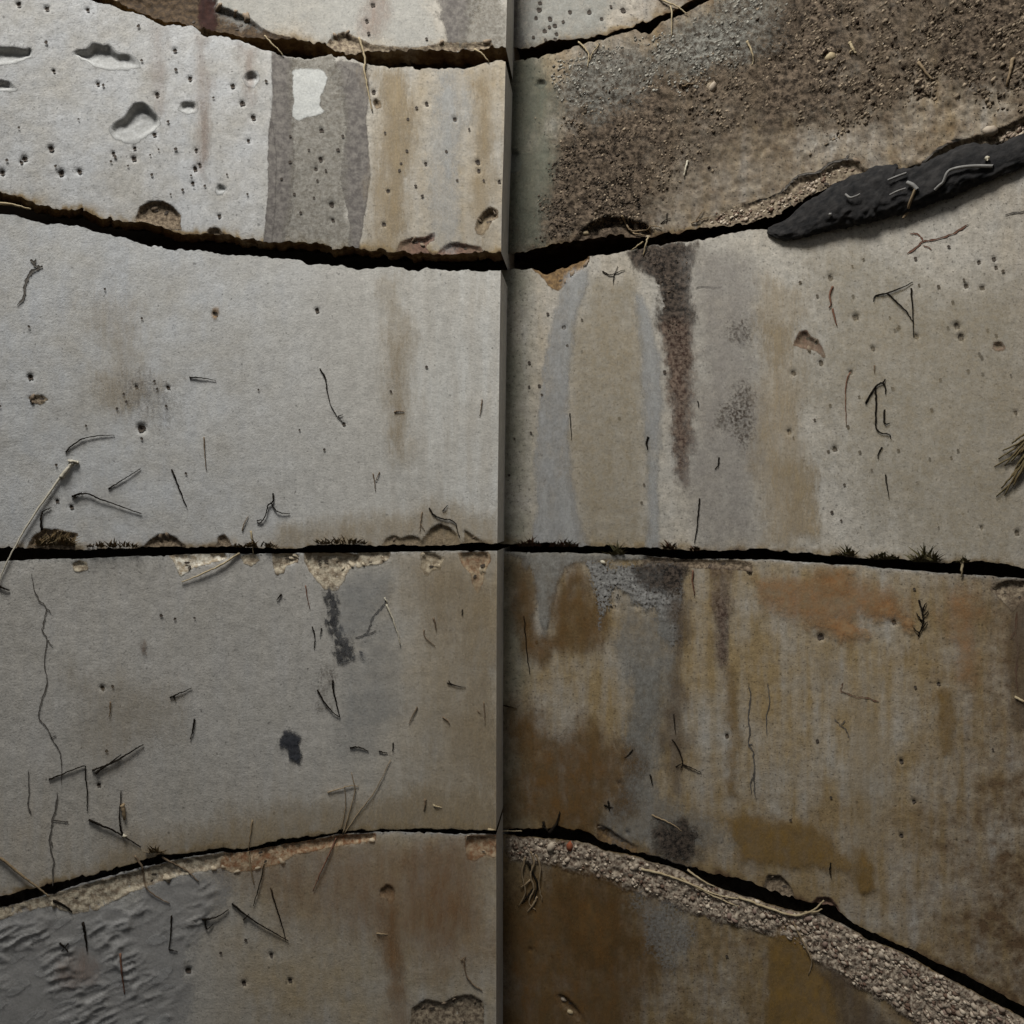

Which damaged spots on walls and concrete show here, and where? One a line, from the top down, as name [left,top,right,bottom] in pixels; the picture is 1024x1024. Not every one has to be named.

spalling [109,101,161,144]
spalling [700,158,869,228]
crack [744,155,853,205]
crack [908,138,962,168]
spalling [917,119,1024,167]
crack [907,224,968,254]
spalling [272,524,491,593]
leakage [513,241,756,864]
leakage [321,588,364,682]
corrosion [522,573,607,662]
leakage [282,733,302,763]
spalling [465,824,1024,1024]